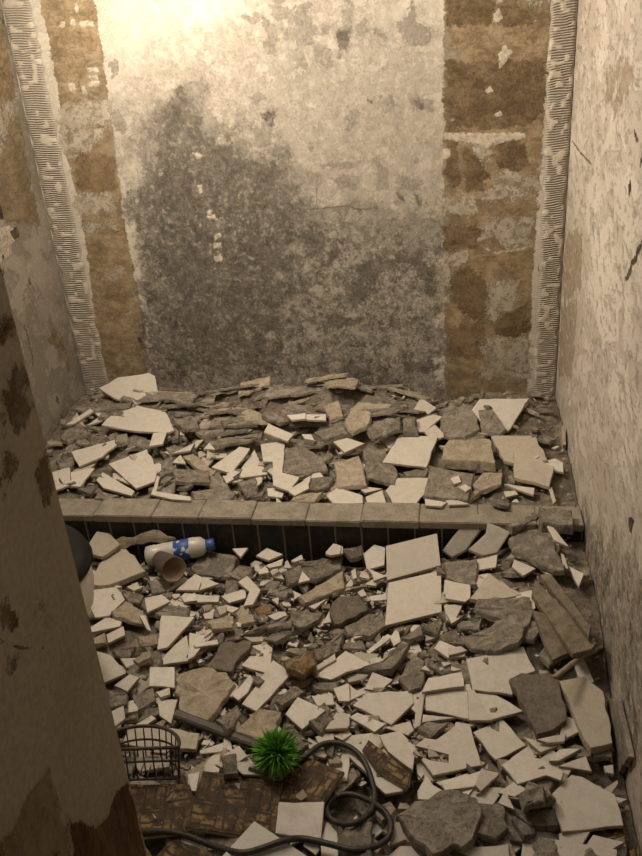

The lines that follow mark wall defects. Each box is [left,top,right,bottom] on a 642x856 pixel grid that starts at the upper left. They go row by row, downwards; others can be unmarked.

flaking render [493,0,504,24]
flaking render [498,44,513,69]
flaking render [0,97,17,158]
flaking render [56,94,127,161]
spalling [0,205,19,273]
flaking render [72,190,119,234]
water stain [120,77,457,403]
flaking render [484,277,522,323]
flaking render [478,336,534,380]
flaking render [0,362,35,434]